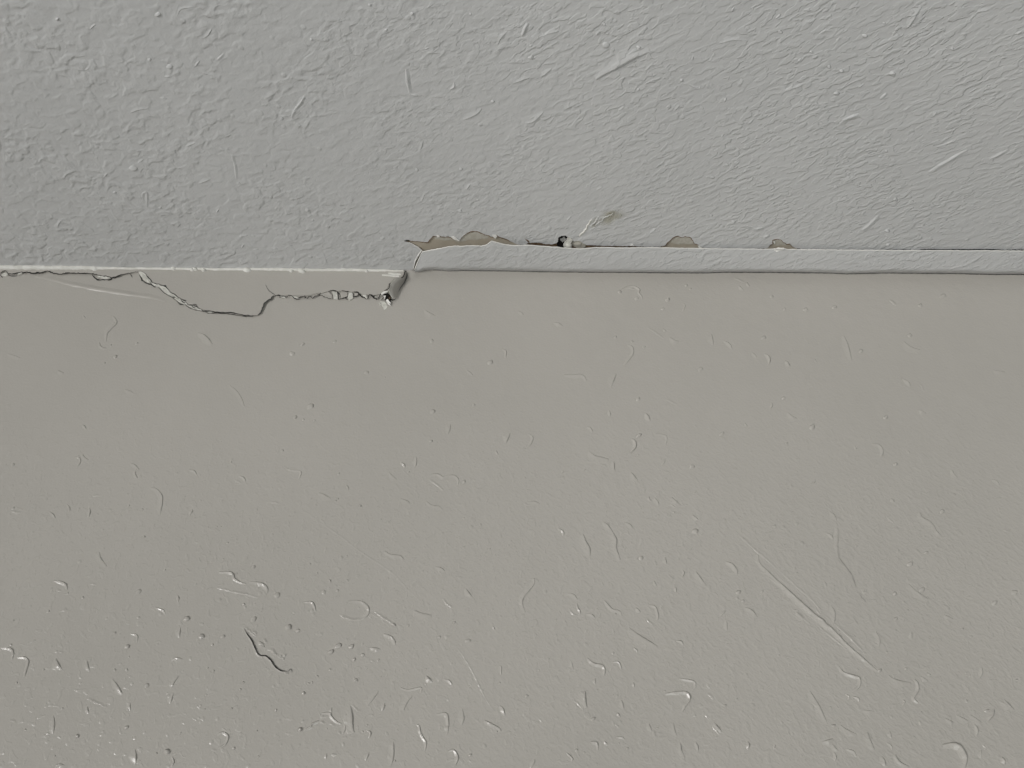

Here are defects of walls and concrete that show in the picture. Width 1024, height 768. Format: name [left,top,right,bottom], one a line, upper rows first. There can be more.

crack [0,271,397,317]
peeling [383,231,1024,301]